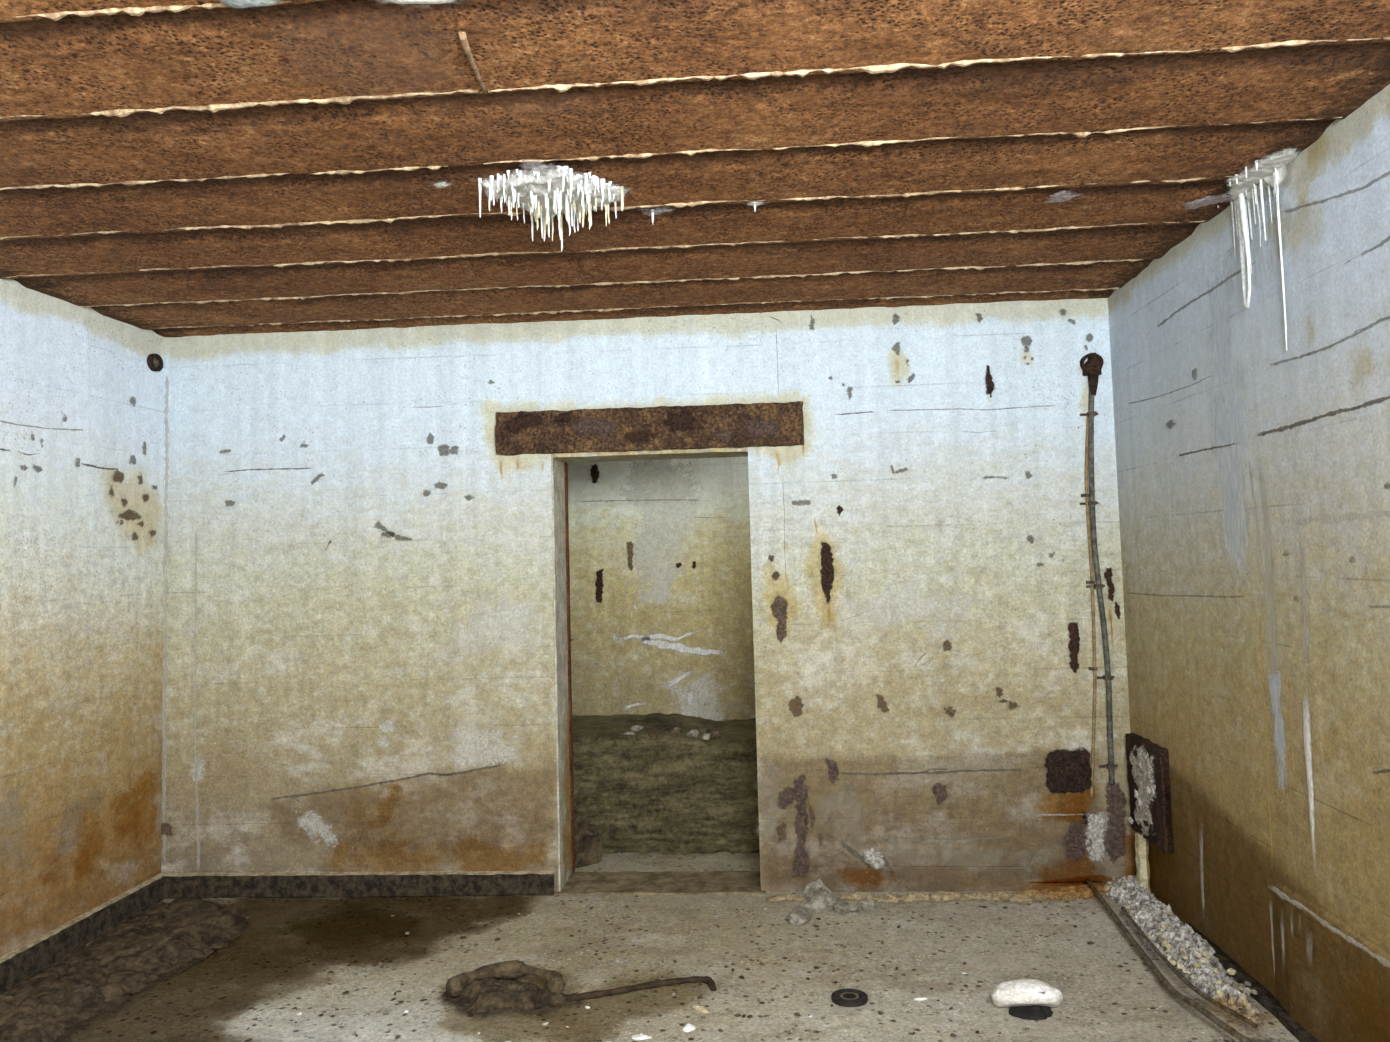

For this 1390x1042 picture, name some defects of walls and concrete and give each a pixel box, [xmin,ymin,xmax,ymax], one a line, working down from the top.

spalling [220,0,282,8]
rust [776,775,823,878]
rust [1062,783,1127,863]